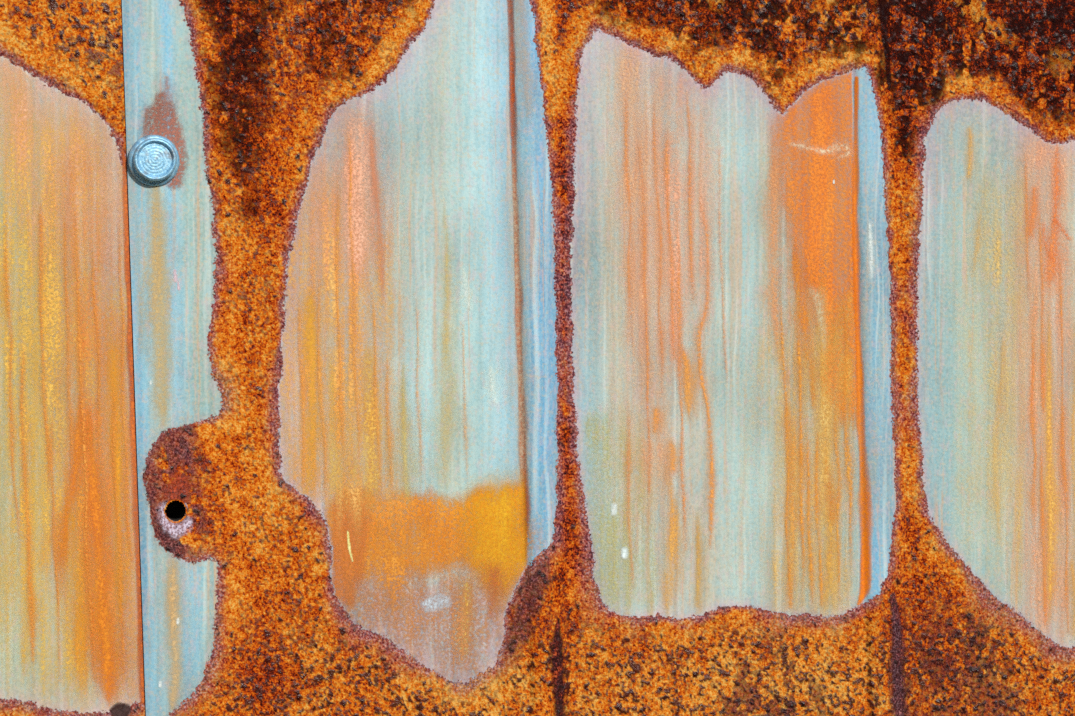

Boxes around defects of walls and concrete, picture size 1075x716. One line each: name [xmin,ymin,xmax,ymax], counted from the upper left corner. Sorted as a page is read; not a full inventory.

rust [0,62,205,716]
rust [200,0,283,212]
rust [280,0,551,673]
rust [588,50,721,607]
rust [768,73,871,605]
rust [599,0,1075,156]
rust [984,141,1075,632]
rust [551,618,565,716]
rust [721,663,823,716]
rust [889,593,1019,716]